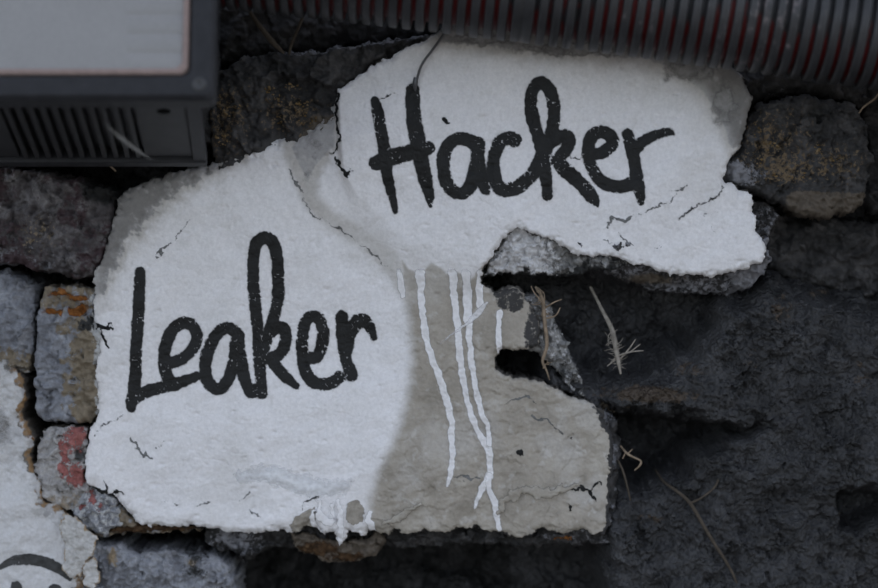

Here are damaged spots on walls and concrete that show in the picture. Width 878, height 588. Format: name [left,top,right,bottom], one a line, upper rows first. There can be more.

crack [607,185,724,246]
spalling [482,228,628,278]
peeling [59,513,101,588]
spalling [290,498,393,546]
leakage [474,472,502,532]